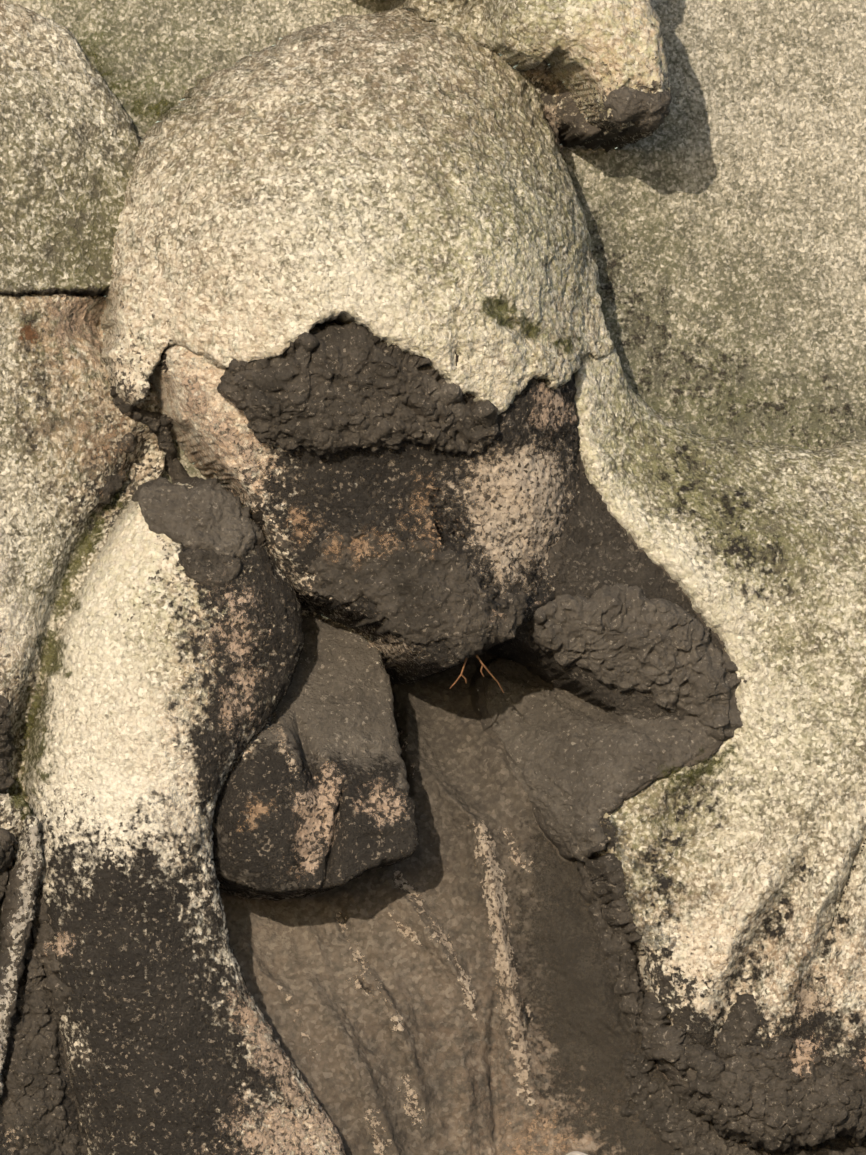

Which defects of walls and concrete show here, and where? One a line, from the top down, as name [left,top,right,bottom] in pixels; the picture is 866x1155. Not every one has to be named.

spalling [162,356,275,478]
peeling [258,355,290,372]
peeling [408,365,466,417]
spalling [286,382,578,611]
peeling [178,548,303,778]
spalling [290,762,344,878]
damp [597,813,618,855]
damp [641,766,733,927]
damp [0,822,41,1095]
damp [641,896,806,1056]
damp [790,901,851,1044]